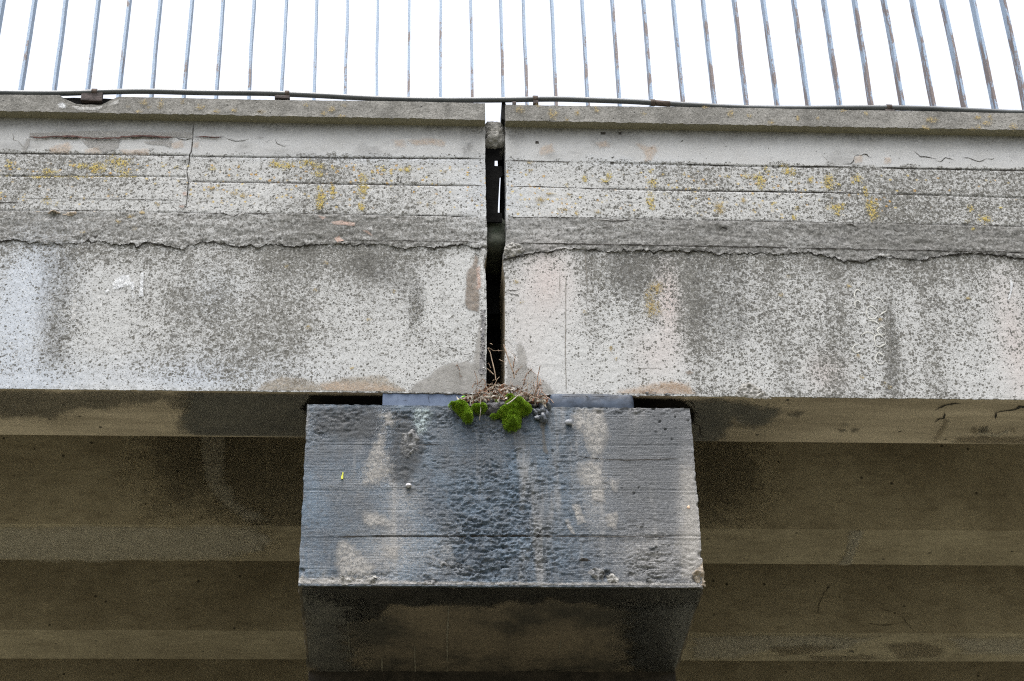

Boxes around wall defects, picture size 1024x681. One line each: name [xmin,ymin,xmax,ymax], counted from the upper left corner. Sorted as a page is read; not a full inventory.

crack [1,102,485,216]
crack [790,151,1022,171]
spalling [503,242,525,260]
leakage [574,408,618,528]
leakage [302,467,877,672]